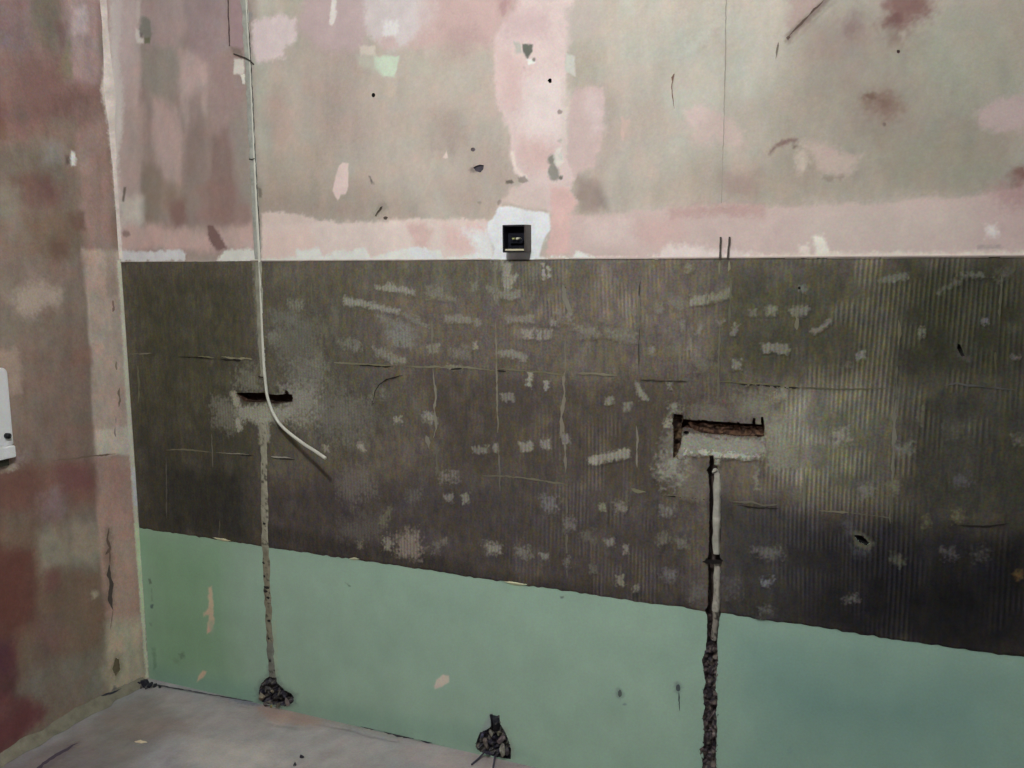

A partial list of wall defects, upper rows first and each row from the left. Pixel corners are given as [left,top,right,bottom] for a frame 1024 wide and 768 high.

crack [100,523,119,628]
peeling [202,584,217,638]